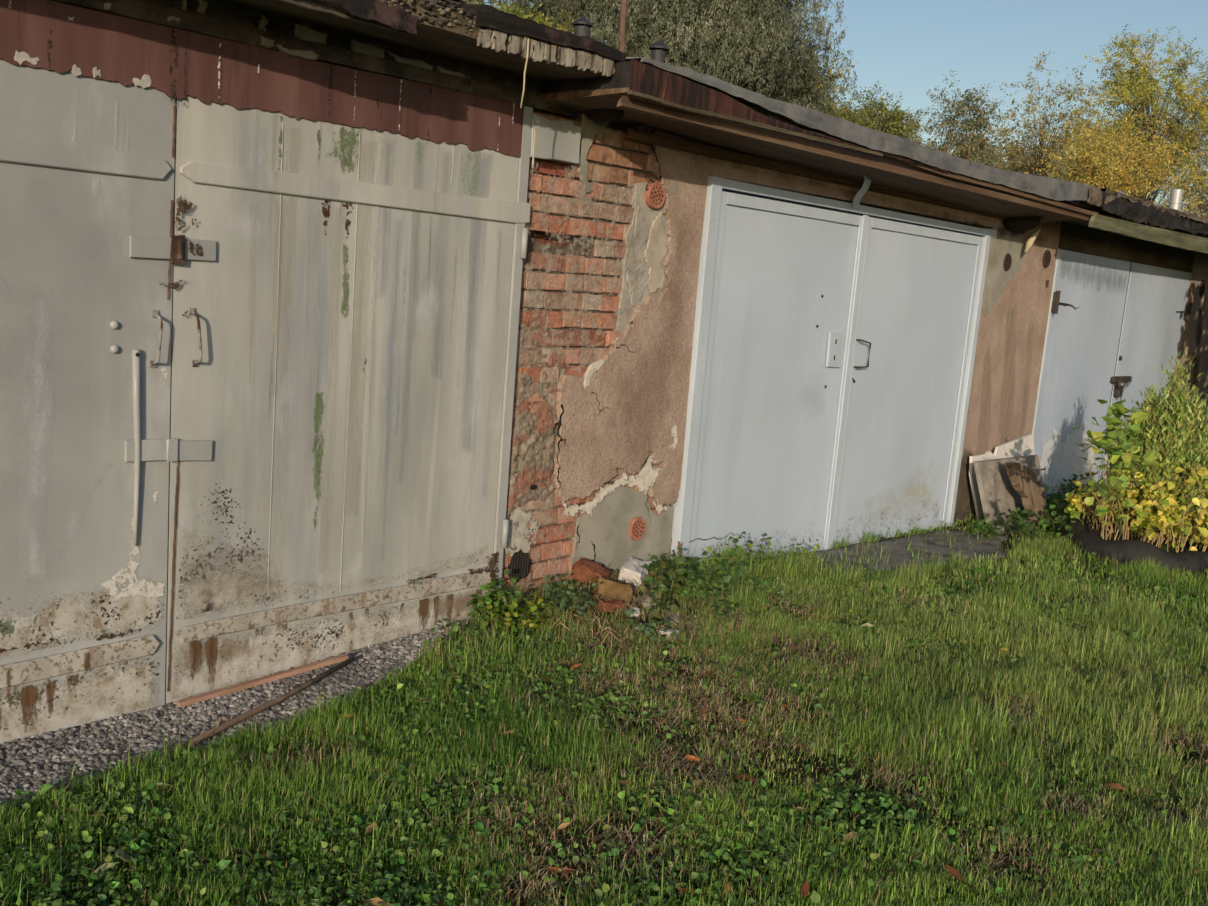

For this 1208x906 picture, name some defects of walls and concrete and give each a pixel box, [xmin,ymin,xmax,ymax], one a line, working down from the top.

peeling [14,51,40,65]
peeling [379,0,615,77]
flaking render [613,182,678,334]
leakage [312,393,324,527]
crack [551,404,567,490]
leakage [0,483,334,654]
corrosion [167,461,180,692]
corrosion [419,552,499,630]
crack [576,525,619,574]
corrosion [6,628,141,732]
corrosion [189,623,287,679]
leakage [0,589,484,743]